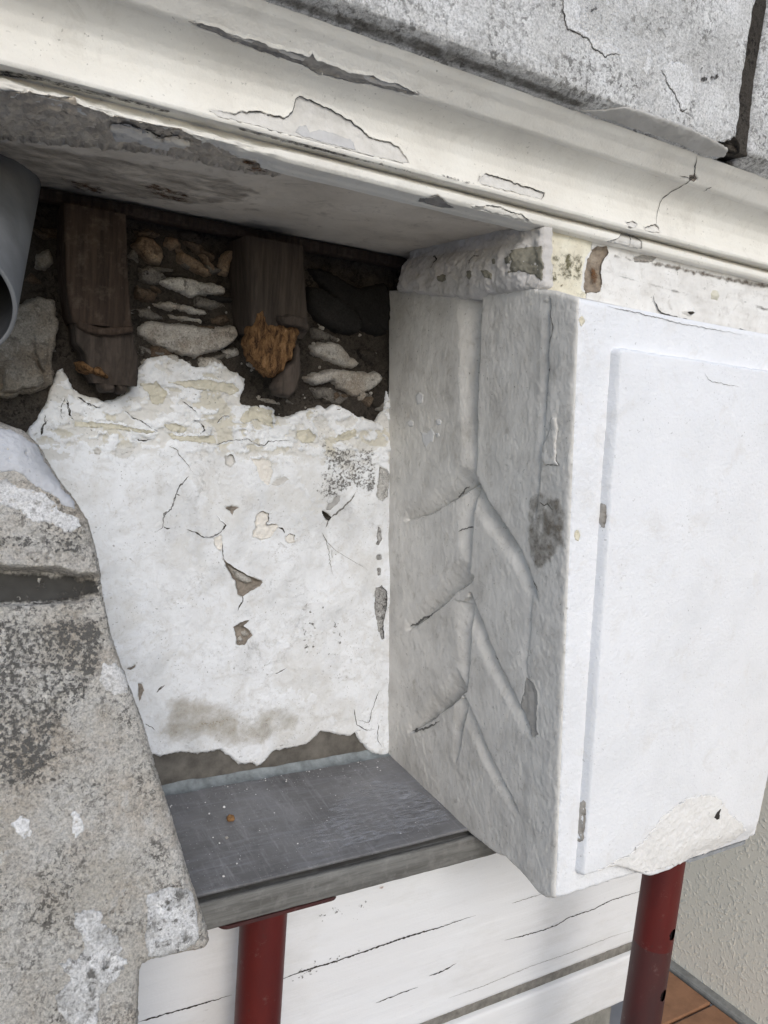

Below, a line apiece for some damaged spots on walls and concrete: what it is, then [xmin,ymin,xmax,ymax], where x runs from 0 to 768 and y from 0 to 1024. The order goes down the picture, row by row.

peeling [188,19,419,94]
flaking render [0,88,280,177]
crack [656,160,711,223]
crack [184,402,292,447]
peeling [0,428,81,533]
crack [41,397,227,558]
crack [322,492,363,576]
flaking render [223,557,262,645]
peeling [373,527,389,642]
flaking render [597,794,746,873]
crack [284,915,476,979]
crack [508,892,637,940]